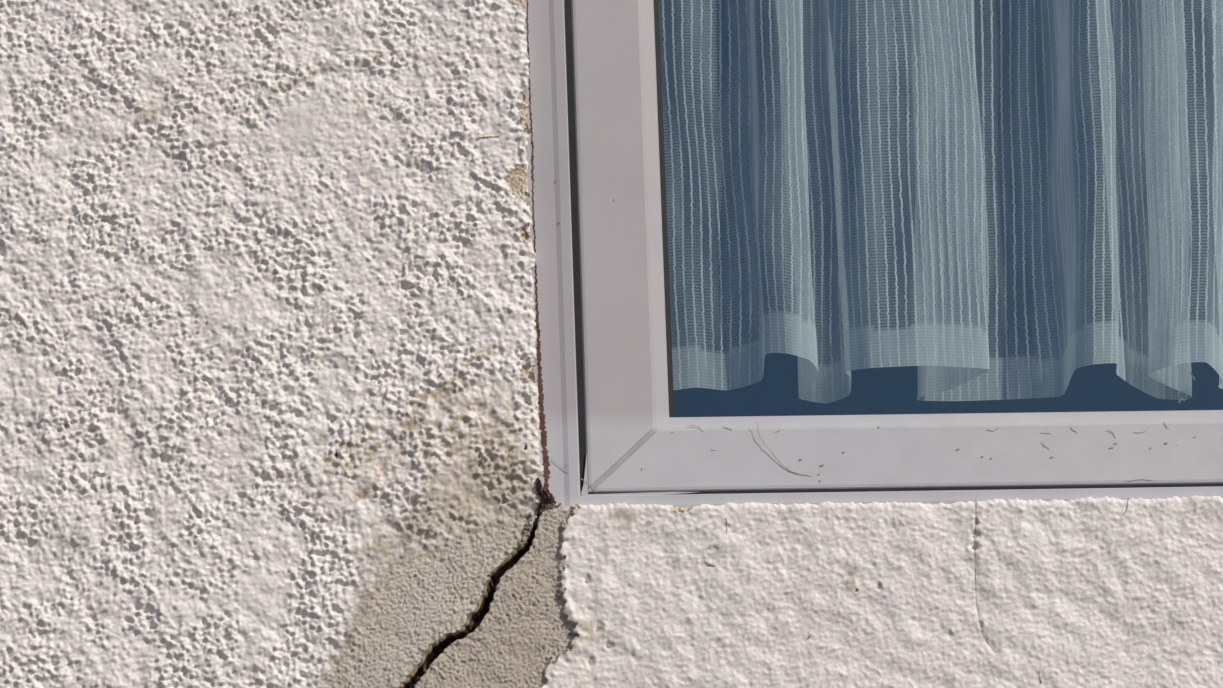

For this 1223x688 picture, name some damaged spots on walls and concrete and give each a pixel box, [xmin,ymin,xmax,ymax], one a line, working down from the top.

spalling [522,363,536,383]
peeling [326,504,581,688]
crack [400,502,545,688]